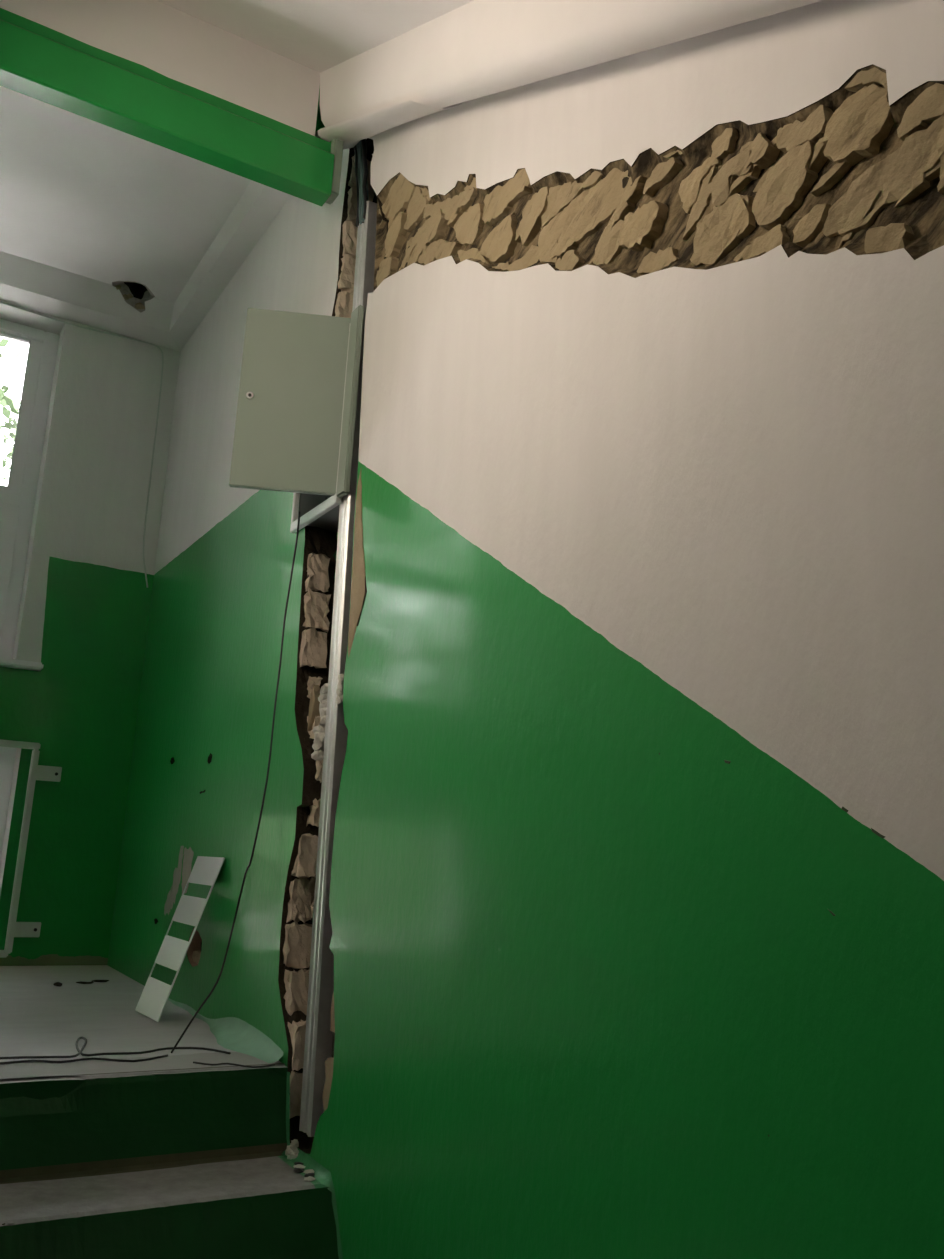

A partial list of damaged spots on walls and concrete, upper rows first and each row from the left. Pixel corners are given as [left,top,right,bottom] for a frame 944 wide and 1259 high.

spalling [374,65,944,290]
spalling [112,281,155,312]
peeling [348,470,367,656]
spalling [322,1057,334,1111]